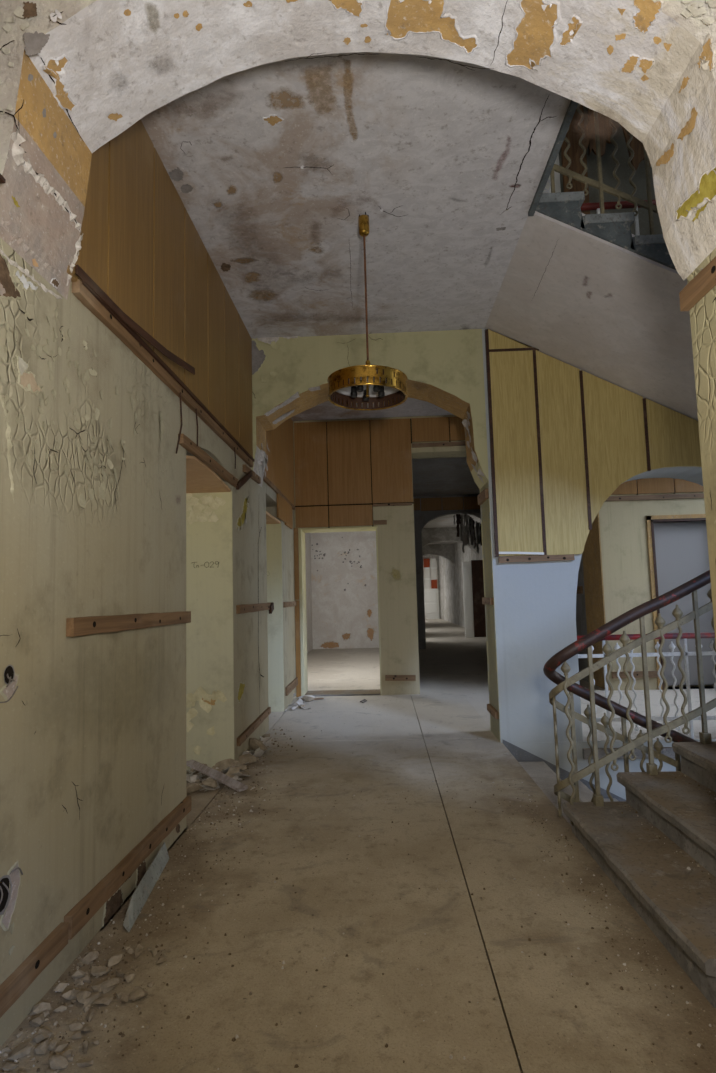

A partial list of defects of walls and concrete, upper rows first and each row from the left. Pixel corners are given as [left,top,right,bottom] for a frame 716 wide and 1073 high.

peeling [3,1,76,112]
peeling [329,0,372,43]
peeling [383,0,480,55]
peeling [505,0,583,73]
peeling [619,53,654,81]
peeling [607,0,672,55]
water stain [270,91,301,108]
water stain [307,60,357,139]
crack [500,96,556,215]
peeling [656,107,698,166]
peeling [0,126,83,301]
peeling [676,166,716,222]